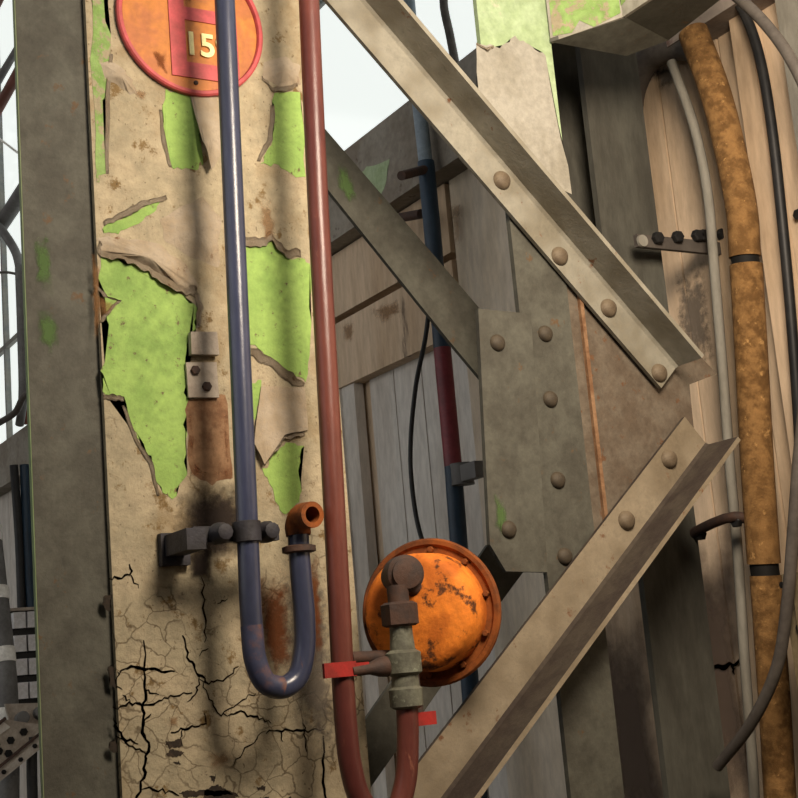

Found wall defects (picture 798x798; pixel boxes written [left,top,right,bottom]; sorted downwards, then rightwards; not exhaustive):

peeling [549,0,625,36]
peeling [90,0,113,182]
peeling [159,89,221,170]
peeling [257,76,306,177]
peeling [363,159,390,193]
peeling [93,195,204,499]
peeling [246,230,311,514]
crack [109,564,139,588]
crack [113,577,327,798]
rust [261,590,290,669]
rust [311,565,322,646]
crack [714,659,739,675]